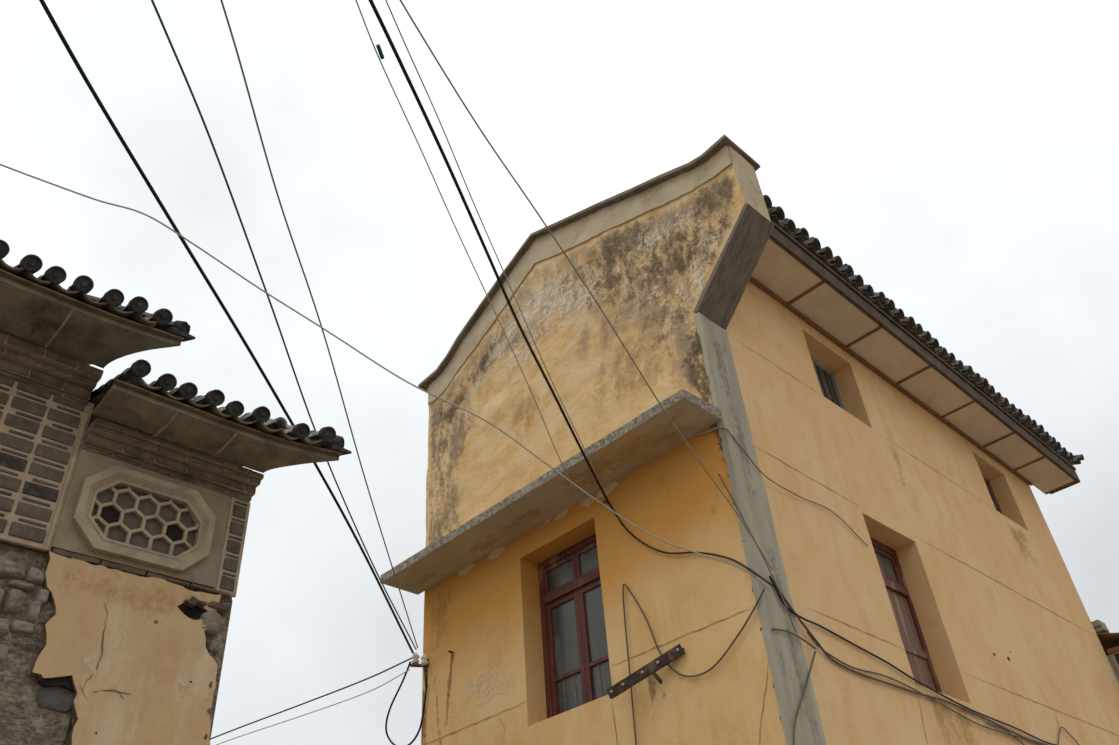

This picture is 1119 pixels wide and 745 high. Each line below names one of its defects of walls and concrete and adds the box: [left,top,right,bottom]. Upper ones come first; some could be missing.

water stain [428,174,734,546]
spalling [0,552,54,663]
spalling [3,670,75,738]
crack [63,605,132,745]
spalling [177,596,231,655]